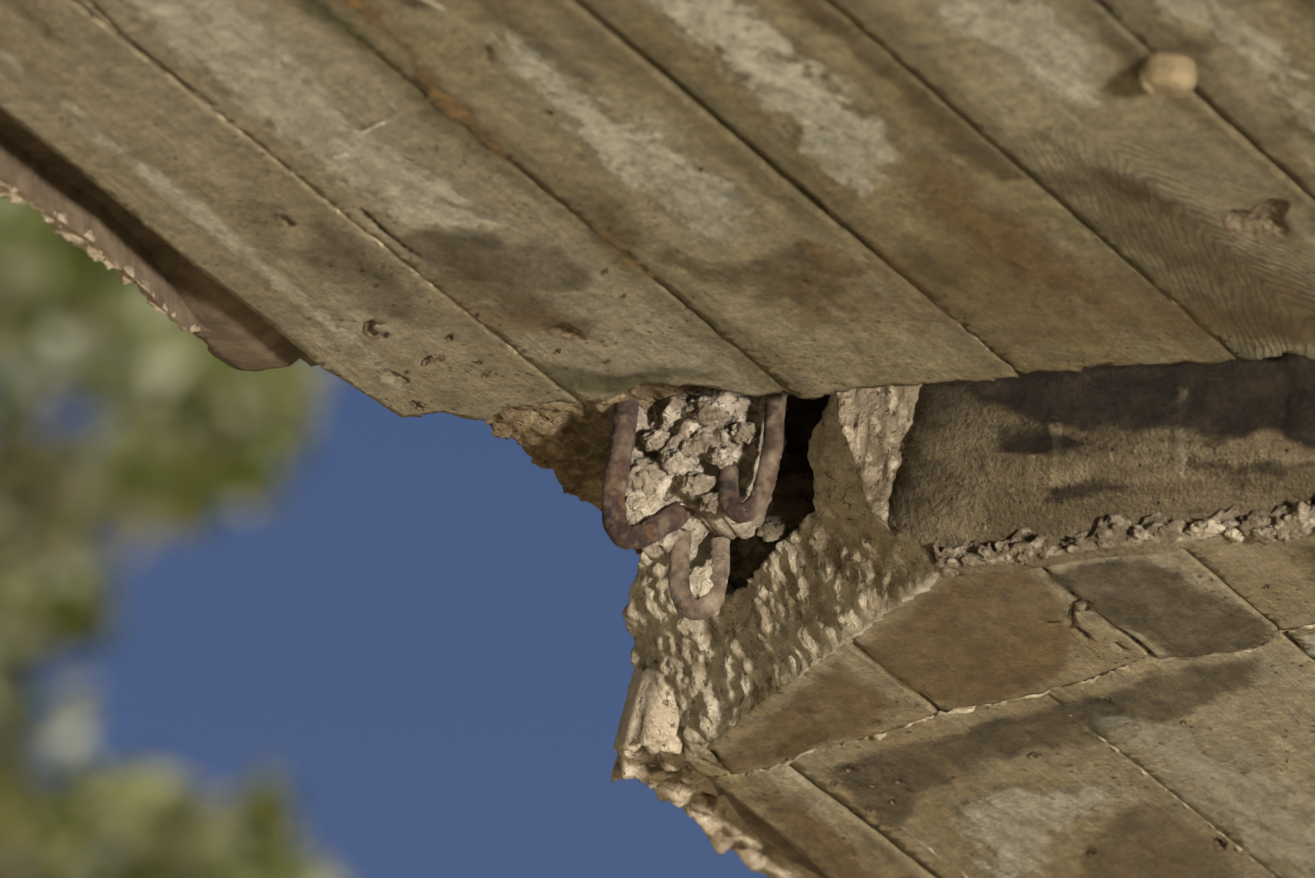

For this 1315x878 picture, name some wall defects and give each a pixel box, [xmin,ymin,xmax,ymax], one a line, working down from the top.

hole [547,322,587,355]
damp [961,168,1315,454]
spalling [611,752,623,782]
spalling [485,383,1315,761]
damp [829,560,1272,830]
damp [1045,482,1121,502]